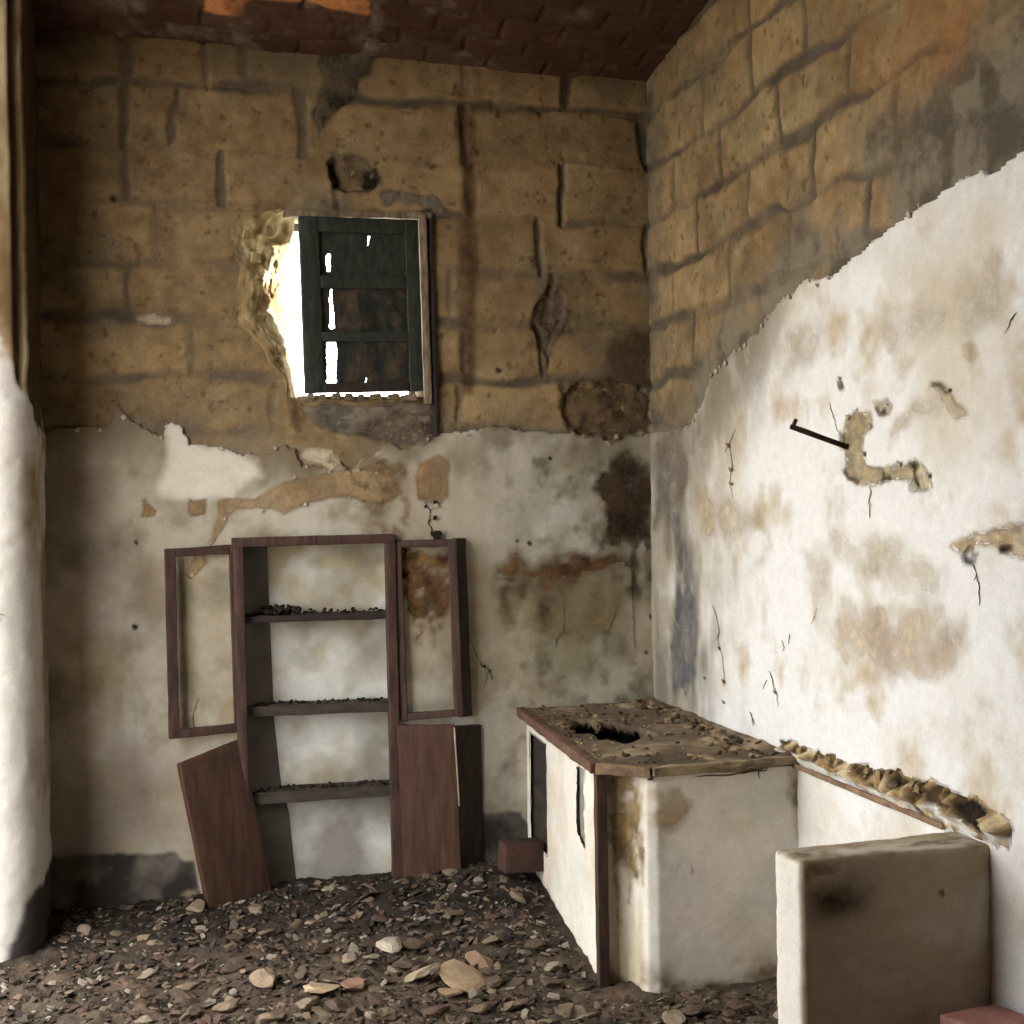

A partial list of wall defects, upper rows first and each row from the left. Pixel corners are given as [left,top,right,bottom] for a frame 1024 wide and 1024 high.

peeling [35,0,1024,577]
leakage [520,437,687,629]
leakage [671,590,696,690]
spalling [962,803,987,830]